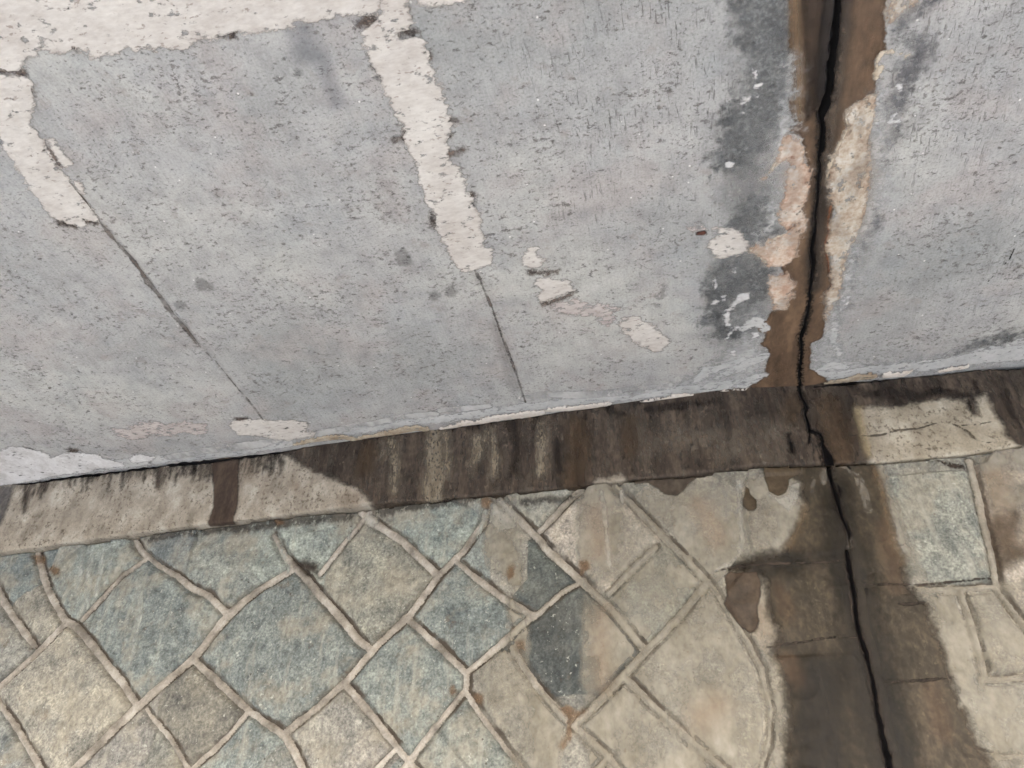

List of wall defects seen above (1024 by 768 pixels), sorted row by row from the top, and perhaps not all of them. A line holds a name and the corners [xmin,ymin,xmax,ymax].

peeling [0,0,494,273]
damp [0,484,12,523]
damp [24,375,764,527]
peeling [522,246,670,353]
damp [277,0,1024,768]
crack [721,0,1024,768]